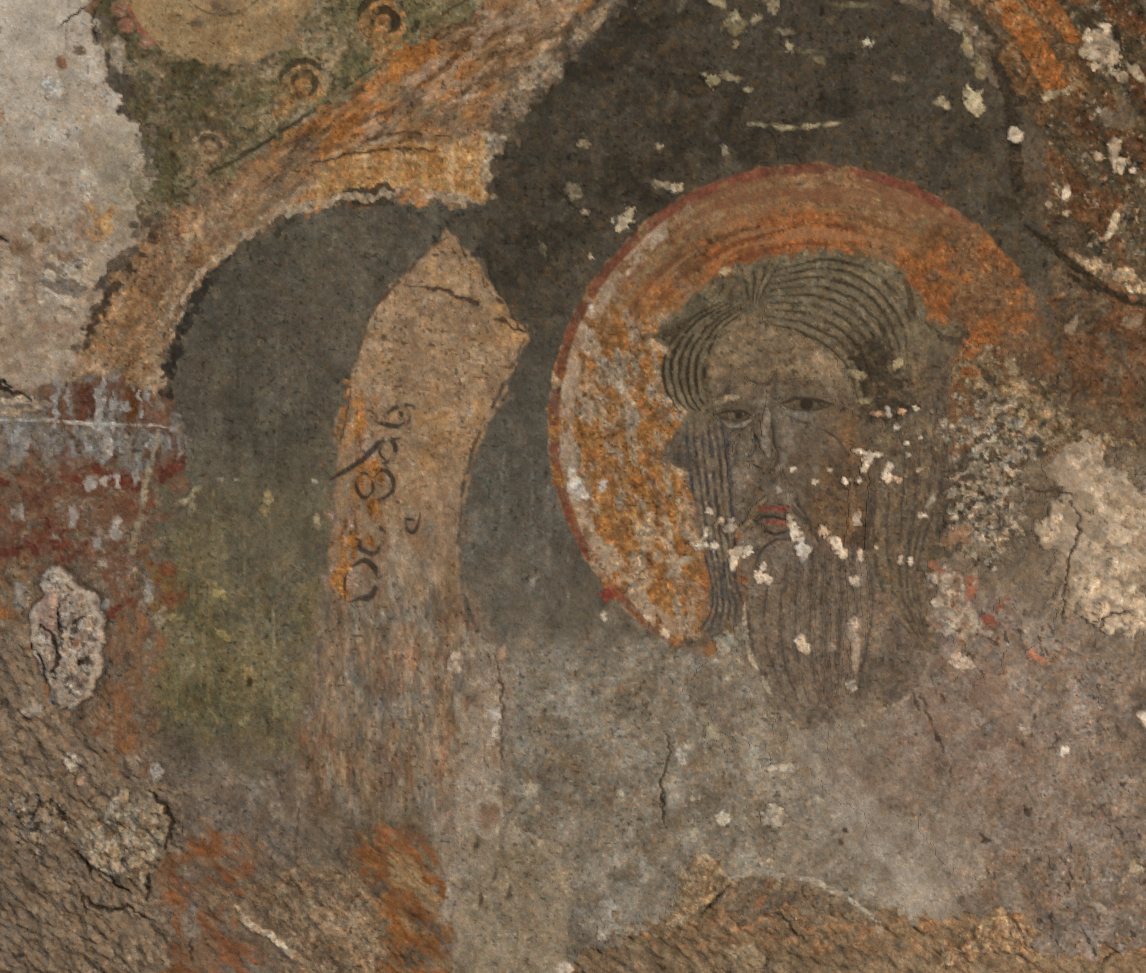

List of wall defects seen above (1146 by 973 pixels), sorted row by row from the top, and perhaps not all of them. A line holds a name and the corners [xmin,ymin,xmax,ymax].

crack [0,235,10,244]
peeling [1044,182,1073,218]
peeling [1103,208,1122,242]
crack [0,378,33,402]
peeling [811,335,1146,649]
peeling [661,505,774,588]
peeling [785,512,879,588]
peeling [793,632,813,655]
peeling [827,615,865,693]
flaking render [0,562,194,973]
flaking render [206,848,397,973]
flaking render [448,812,1146,973]